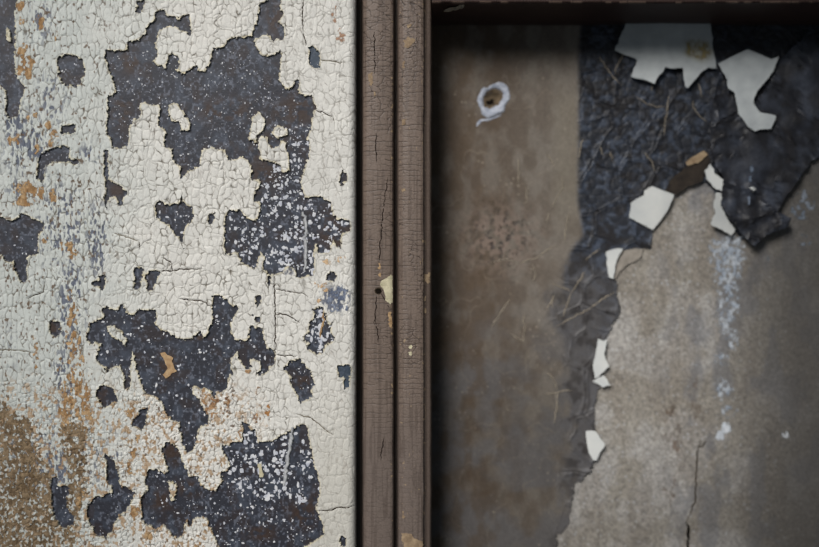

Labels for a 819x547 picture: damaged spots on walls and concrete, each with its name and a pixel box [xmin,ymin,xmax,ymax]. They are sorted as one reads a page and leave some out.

peeling [103,0,351,288]
spalling [477,82,510,126]
peeling [0,213,44,284]
crack [159,258,198,272]
crack [273,276,308,357]
spalling [550,23,819,547]
water stain [709,236,745,363]
corrosion [0,290,94,547]
corrosion [124,403,140,475]
peeling [86,295,325,547]
water stain [715,380,733,440]
crack [686,441,707,547]